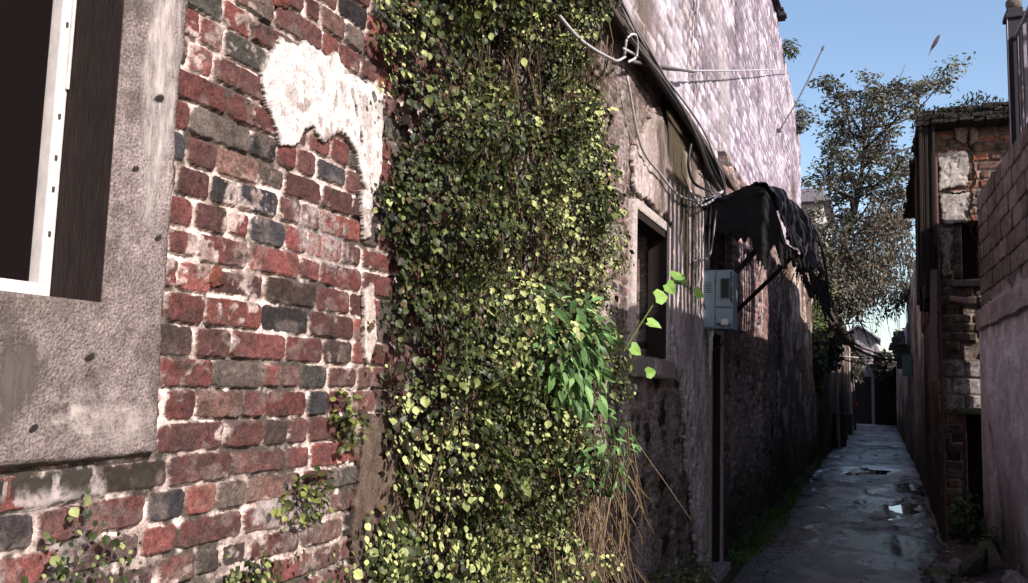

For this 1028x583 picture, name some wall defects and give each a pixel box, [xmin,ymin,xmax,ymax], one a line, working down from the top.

flaking render [258,36,384,240]